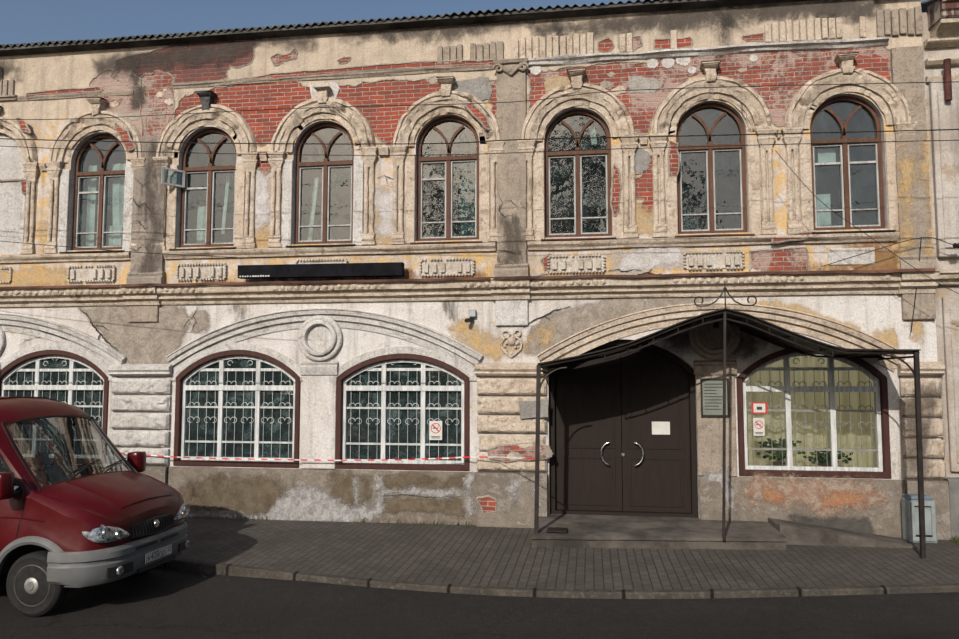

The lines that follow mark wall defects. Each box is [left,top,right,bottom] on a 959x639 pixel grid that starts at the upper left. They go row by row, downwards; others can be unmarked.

flaking render [526,32,892,136]
flaking render [26,38,497,253]
damp [502,215,519,263]
flaking render [749,231,817,272]
crack [80,309,119,352]
flaking render [476,495,497,514]